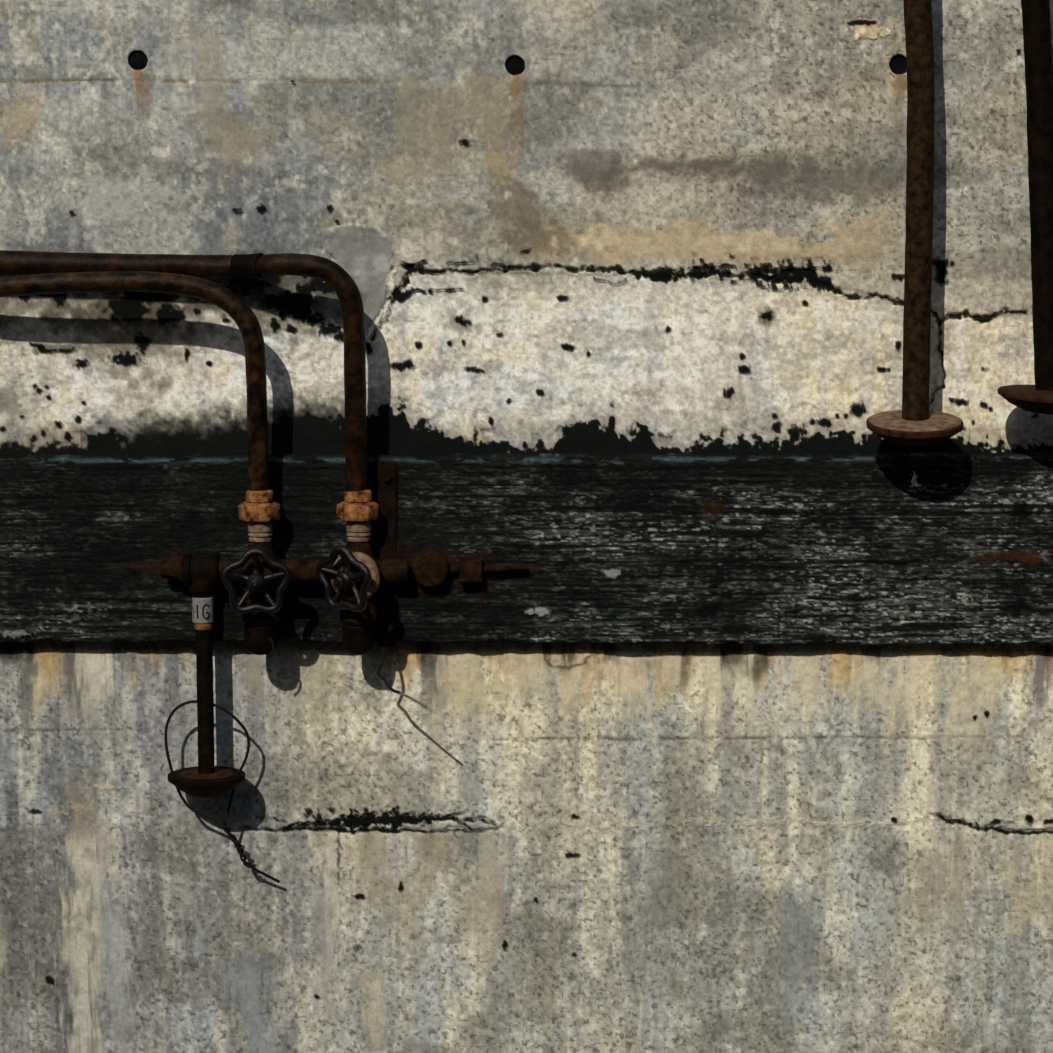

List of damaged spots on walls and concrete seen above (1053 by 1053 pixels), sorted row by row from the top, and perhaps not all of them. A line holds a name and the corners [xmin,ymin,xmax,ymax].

peeling [319,205,396,341]
crack [371,248,904,341]
crack [929,309,1028,406]
leakage [3,641,114,728]
leakage [388,642,486,709]
leakage [495,643,1053,736]
crack [238,805,502,899]
crack [934,814,1053,835]
leakage [55,835,127,1053]
leakage [312,845,340,982]